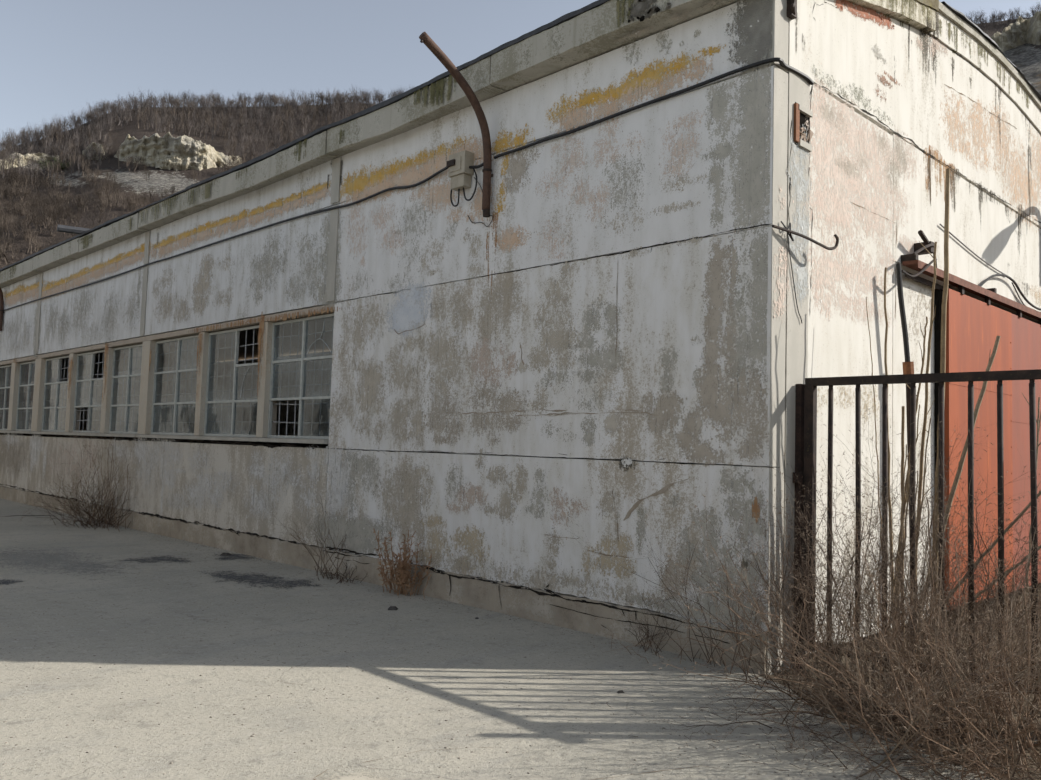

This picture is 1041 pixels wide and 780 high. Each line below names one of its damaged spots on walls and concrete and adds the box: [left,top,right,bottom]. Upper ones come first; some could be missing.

water stain [414,74,456,107]
water stain [812,67,893,126]
water stain [881,0,1032,254]
peeling [0,0,921,650]
crack [1,484,78,517]
crack [139,512,296,544]
crack [323,547,381,564]
crack [411,563,757,644]